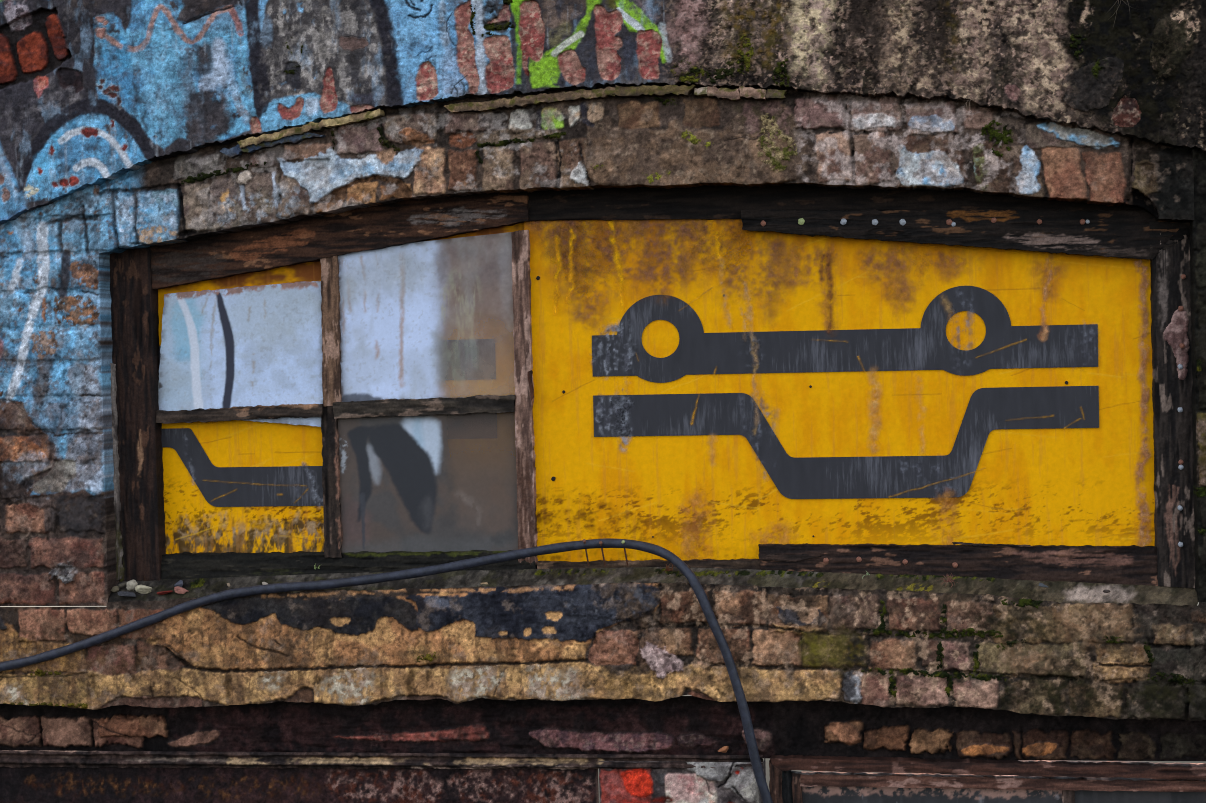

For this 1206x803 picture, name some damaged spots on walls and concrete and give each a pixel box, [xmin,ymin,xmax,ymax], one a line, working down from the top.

flaking render [0,0,121,138]
flaking render [415,61,439,101]
flaking render [454,0,545,94]
flaking render [558,5,662,85]
water stain [667,0,704,67]
water stain [724,0,834,83]
water stain [847,0,1189,130]
peeling [38,167,79,187]
peeling [277,127,435,213]
water stain [1196,420,1206,455]
spalling [111,579,188,597]
peeling [201,582,660,667]